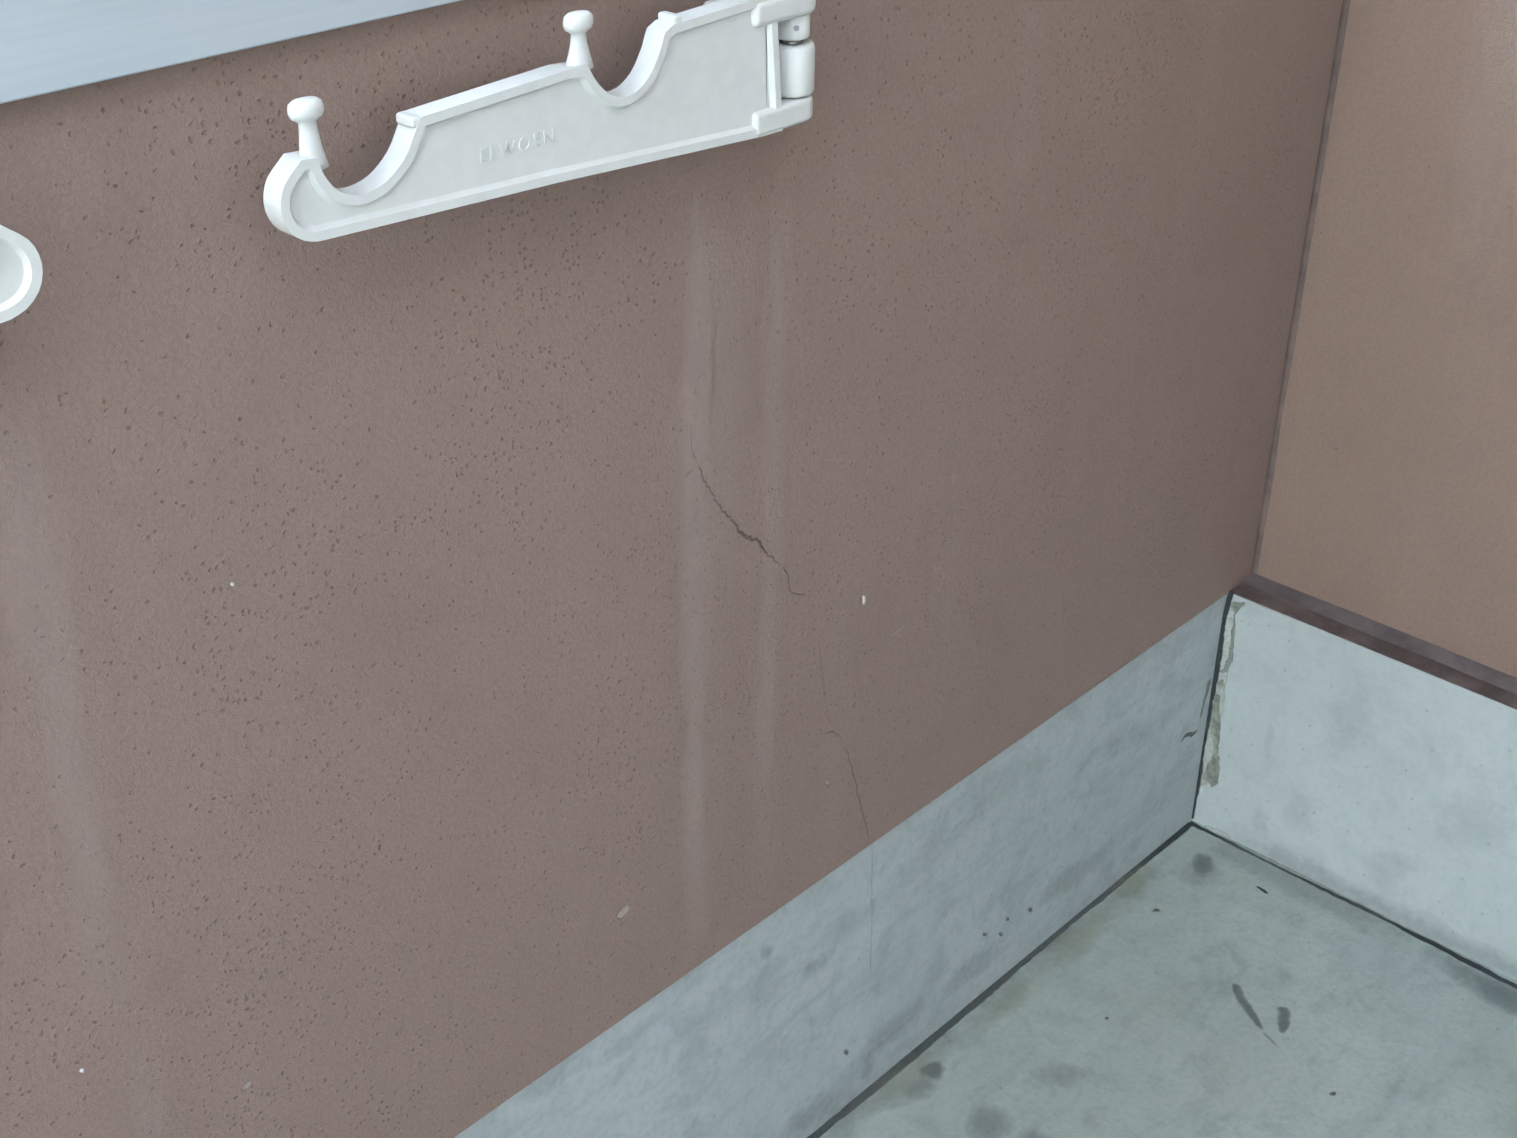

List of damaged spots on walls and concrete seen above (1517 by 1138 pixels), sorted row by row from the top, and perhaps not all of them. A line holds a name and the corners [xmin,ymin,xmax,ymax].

crack [699,468,804,595]
peeling [1201,602,1245,788]